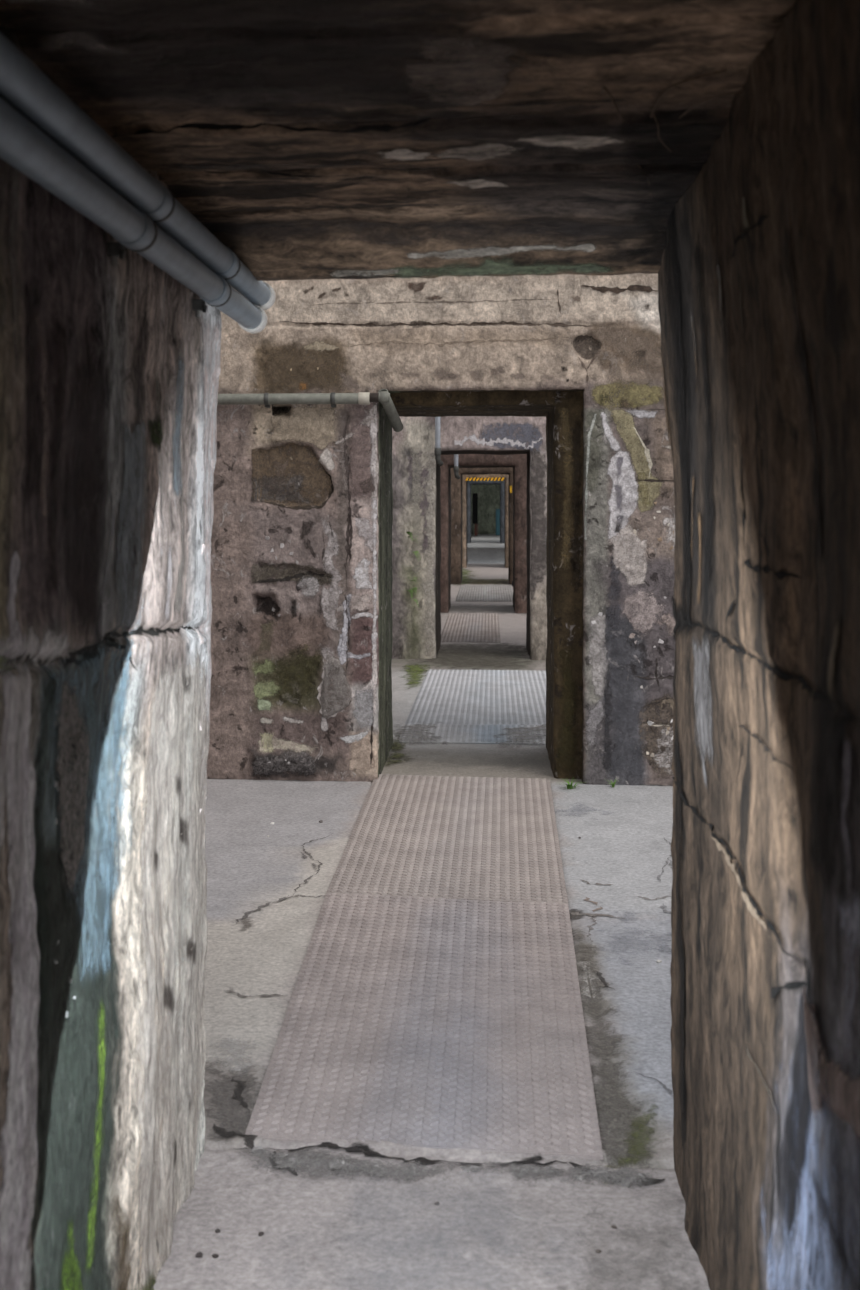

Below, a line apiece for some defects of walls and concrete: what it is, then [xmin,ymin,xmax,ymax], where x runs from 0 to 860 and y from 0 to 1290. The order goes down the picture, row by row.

crack [740,441,803,579]
peeling [609,525,676,648]
damp [0,167,184,1265]
crack [0,626,199,717]
spalling [638,694,674,778]
crack [634,599,860,721]
spalling [136,320,653,1290]
crack [236,833,333,931]
crack [570,838,672,944]
crack [672,775,808,1004]
crack [234,990,285,998]